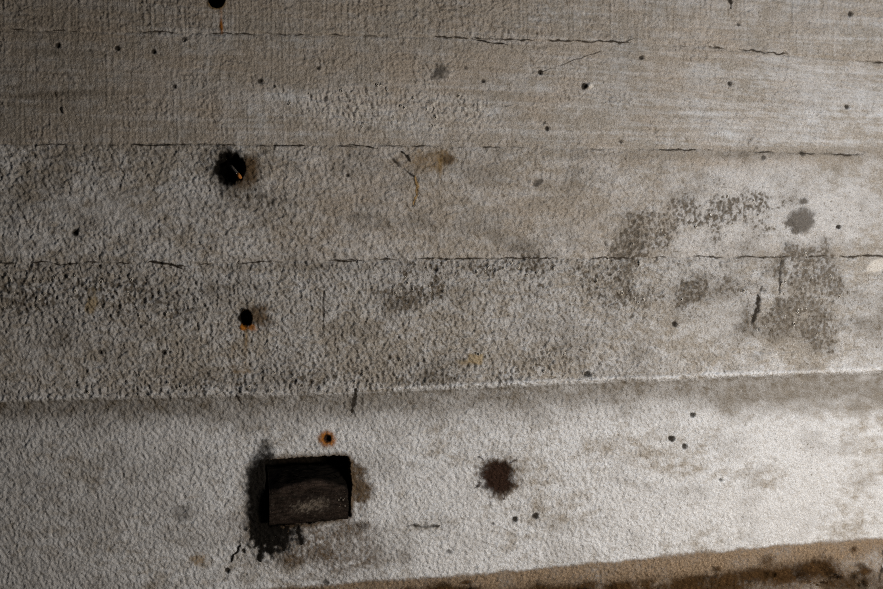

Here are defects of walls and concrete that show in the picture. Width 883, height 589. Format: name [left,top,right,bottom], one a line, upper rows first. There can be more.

damp [785,198,815,234]
rust [319,431,335,446]
damp [278,454,376,573]
damp [278,538,883,589]